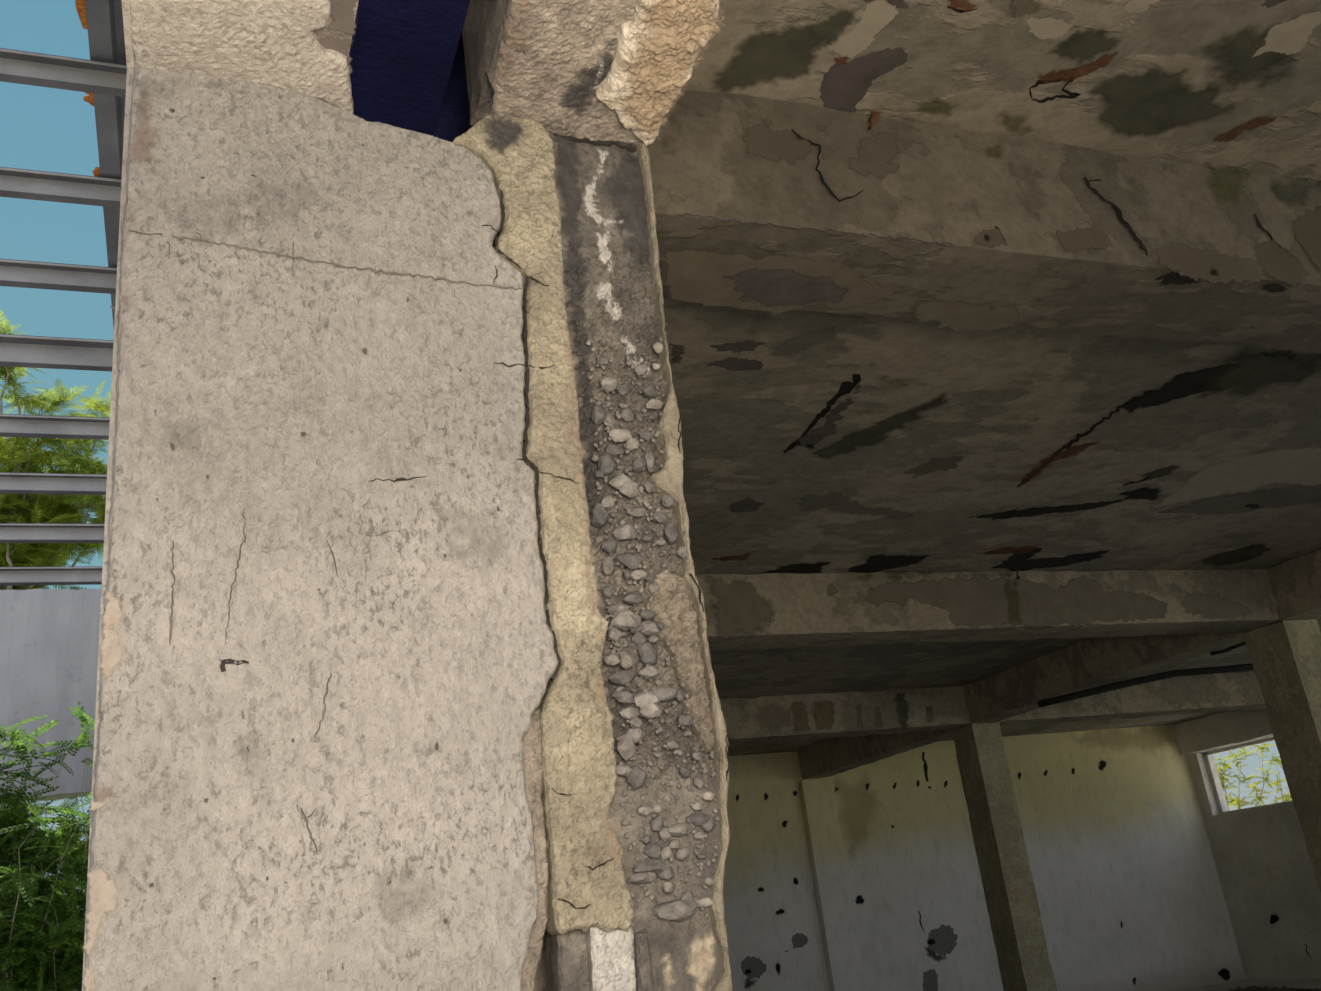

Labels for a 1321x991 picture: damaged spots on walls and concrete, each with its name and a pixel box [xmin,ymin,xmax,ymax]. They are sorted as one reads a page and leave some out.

rust [75,0,88,29]
spalling [820,0,908,112]
rust [1029,52,1117,103]
rust [1214,116,1276,142]
crack [1261,0,1286,8]
peeling [1253,11,1321,57]
crack [678,129,952,245]
crack [1084,176,1148,255]
crack [130,189,580,680]
flaking render [590,342,687,559]
flaking render [604,570,677,776]
flaking render [626,750,716,922]